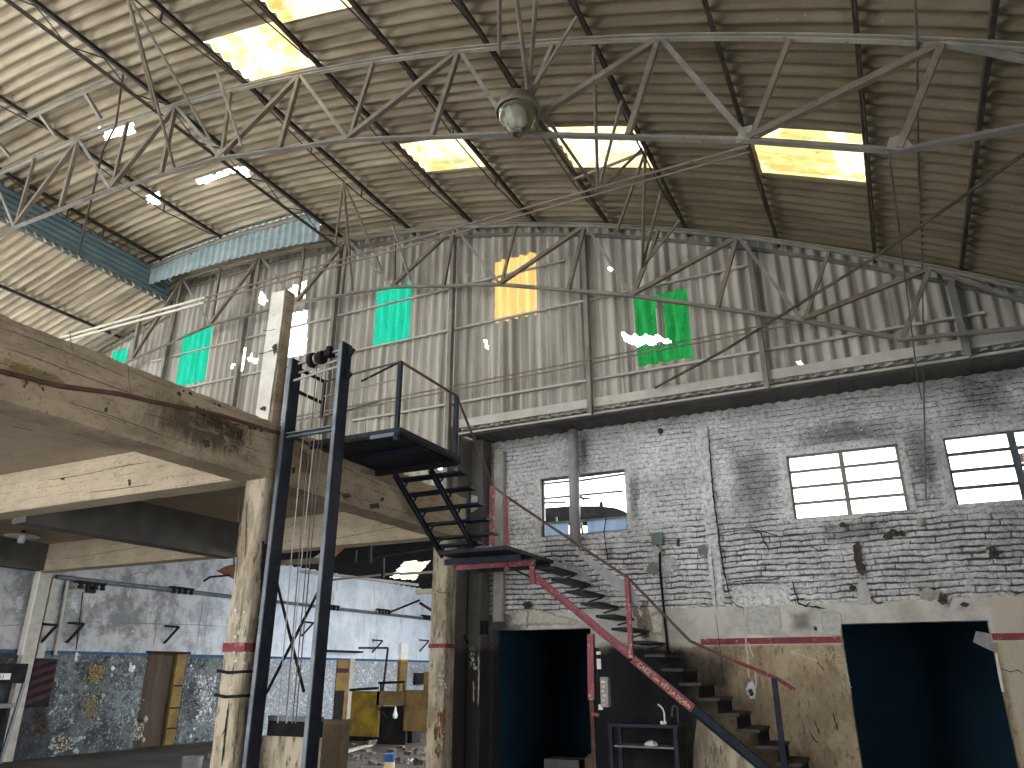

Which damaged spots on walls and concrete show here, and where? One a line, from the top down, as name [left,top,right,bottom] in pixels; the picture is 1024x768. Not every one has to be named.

leakage [161,402,243,453]
crack [633,431,827,691]
spalling [849,542,867,591]
spalling [883,528,908,540]
spalling [985,544,1004,560]